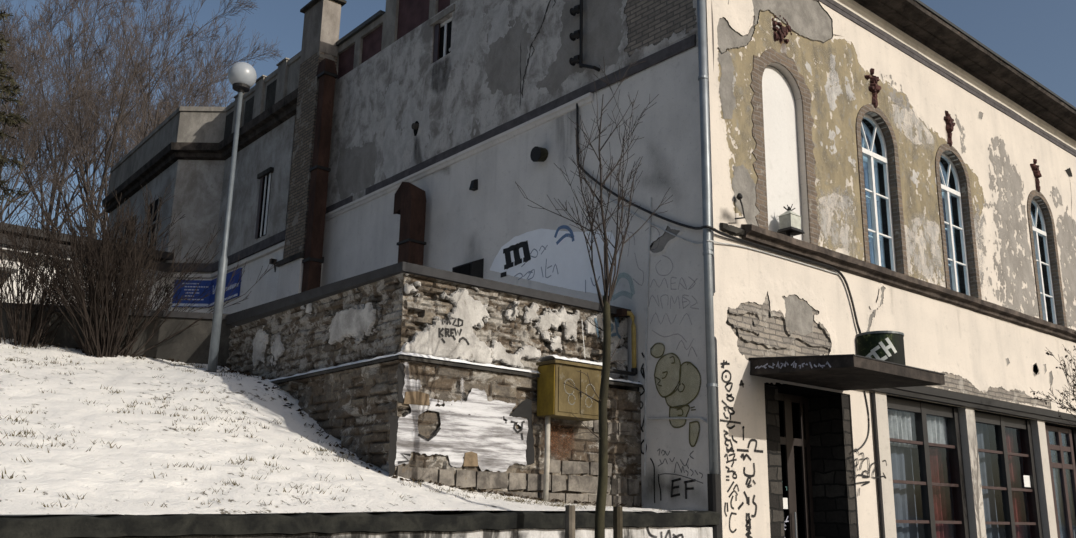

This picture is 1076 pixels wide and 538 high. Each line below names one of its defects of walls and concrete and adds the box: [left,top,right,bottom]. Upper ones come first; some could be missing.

crack [520,0,556,103]
peeling [483,0,698,96]
peeling [711,0,1039,317]
peeling [328,302,379,345]
peeling [401,273,421,301]
spalling [647,221,684,257]
spalling [713,267,843,384]
peeling [1050,186,1076,328]
peeling [395,287,628,472]